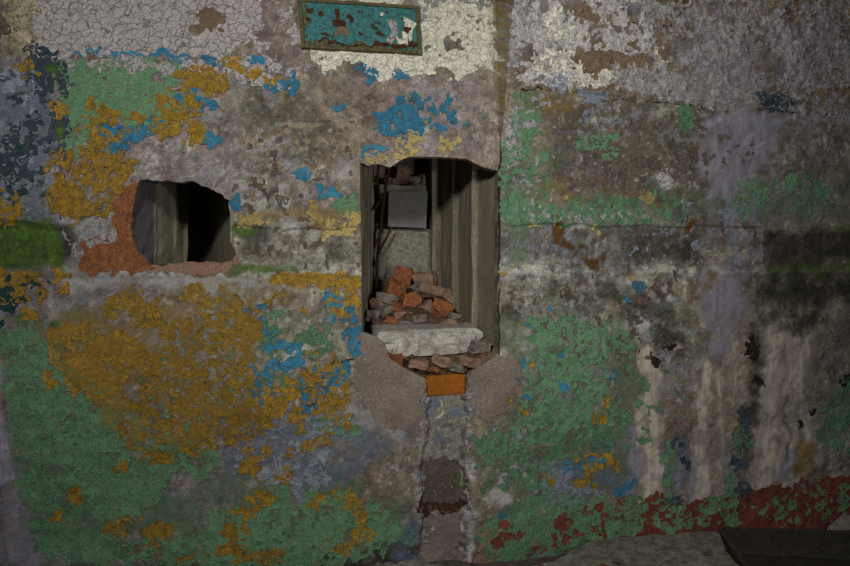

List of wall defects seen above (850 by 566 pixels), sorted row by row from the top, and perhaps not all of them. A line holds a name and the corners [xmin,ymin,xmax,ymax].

leakage [0,414,16,485]
peeling [0,0,421,566]
peeling [278,0,850,563]
leakage [606,281,739,504]